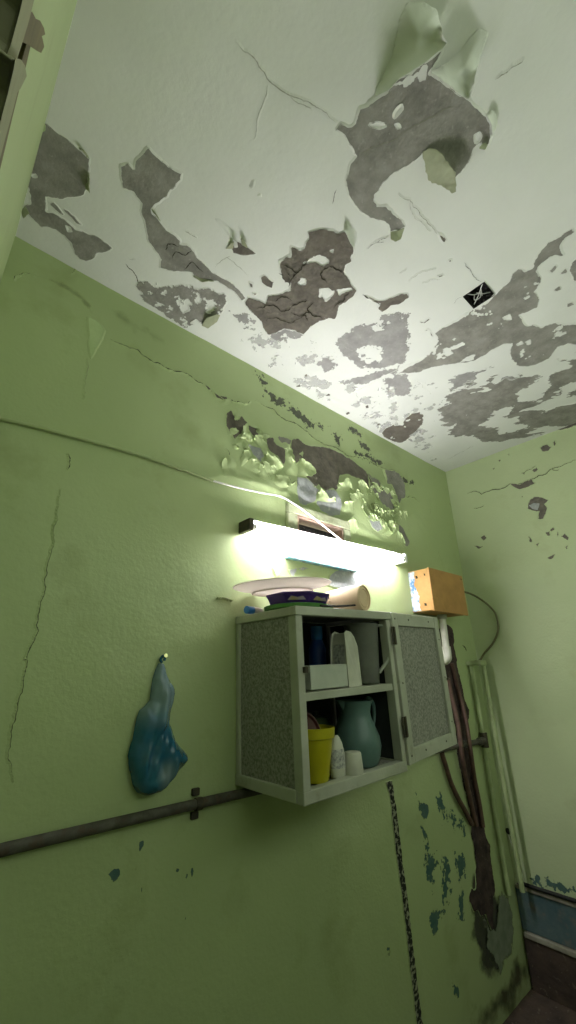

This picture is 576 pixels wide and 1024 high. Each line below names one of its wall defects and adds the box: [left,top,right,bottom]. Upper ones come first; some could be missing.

peeling [22,122,113,262]
crack [236,38,338,142]
peeling [335,2,497,242]
peeling [118,145,576,452]
crack [110,339,431,503]
peeling [510,467,569,560]
crack [5,453,71,783]
peeling [415,625,495,936]
peeling [530,875,576,894]